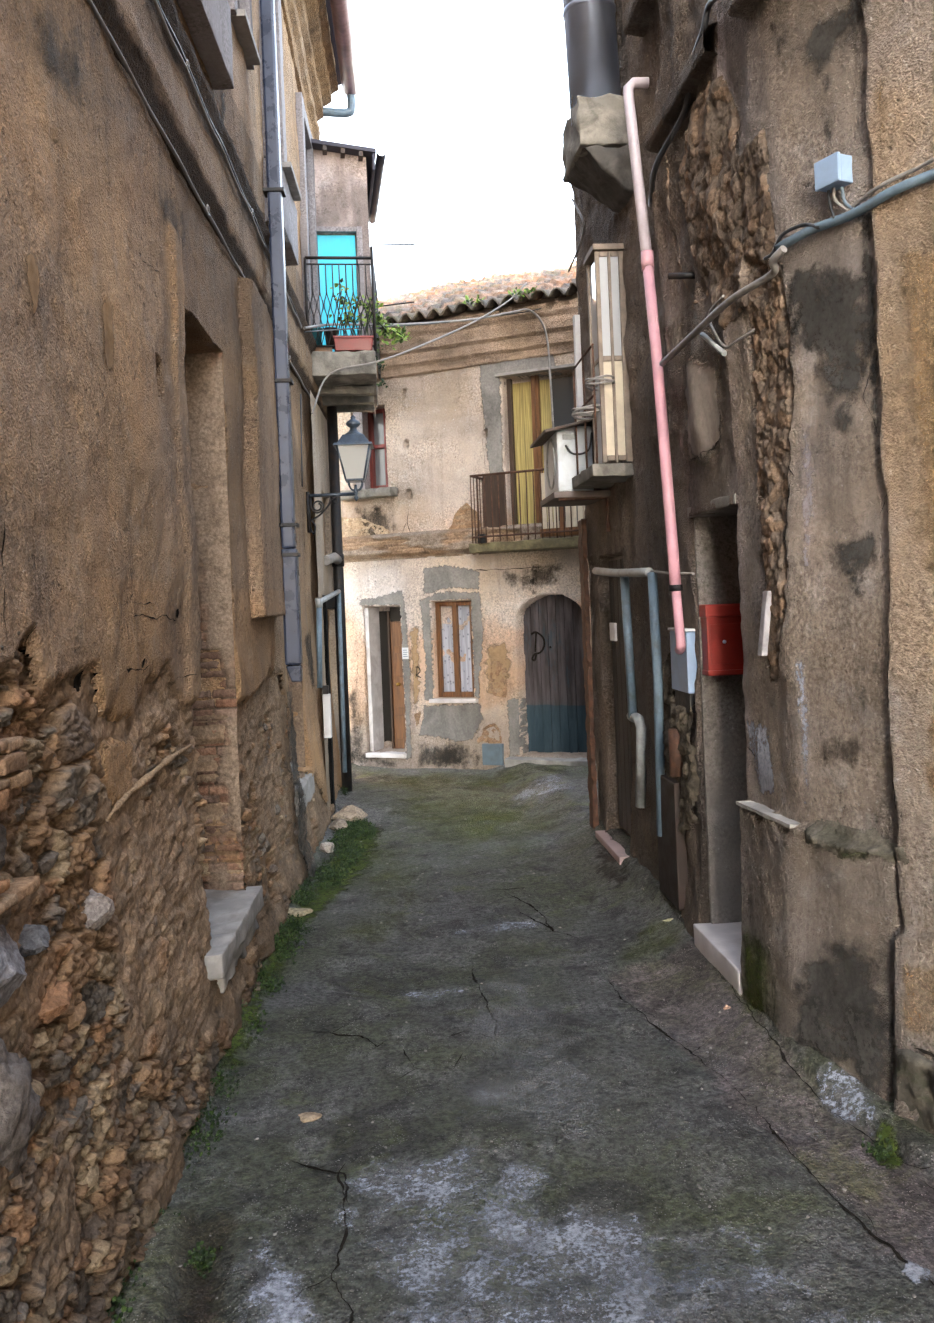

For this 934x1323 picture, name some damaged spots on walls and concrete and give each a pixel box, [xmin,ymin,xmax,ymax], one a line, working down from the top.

spalling [664,75,795,683]
spalling [0,631,335,1323]
crack [609,972,934,1285]
water stain [794,942,894,1135]
water stain [248,1242,314,1323]
crack [279,1161,354,1323]
water stain [346,1146,811,1323]